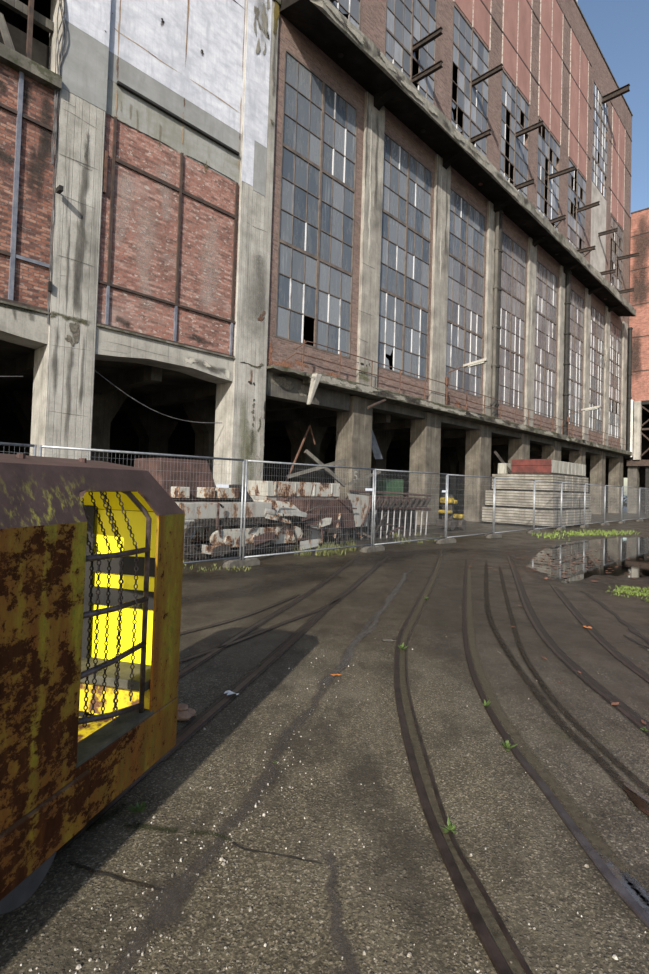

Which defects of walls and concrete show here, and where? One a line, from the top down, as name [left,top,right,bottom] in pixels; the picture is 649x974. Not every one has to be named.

peeling [254,0,270,55]
damp [66,143,88,304]